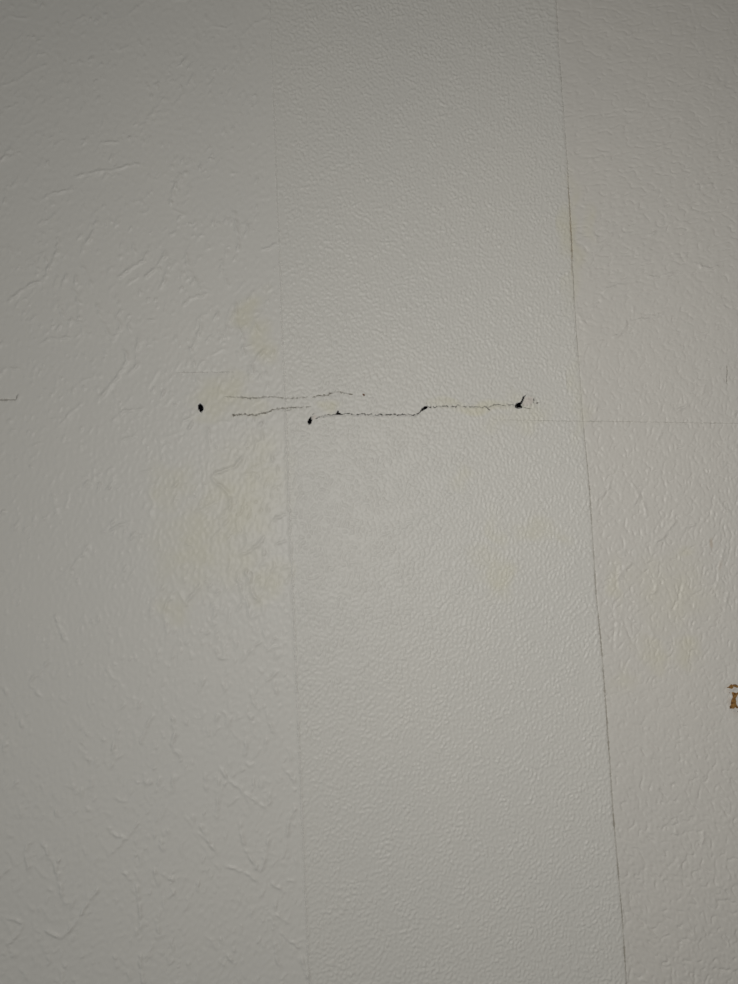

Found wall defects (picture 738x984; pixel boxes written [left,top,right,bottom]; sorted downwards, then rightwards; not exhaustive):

crack [232,393,538,425]